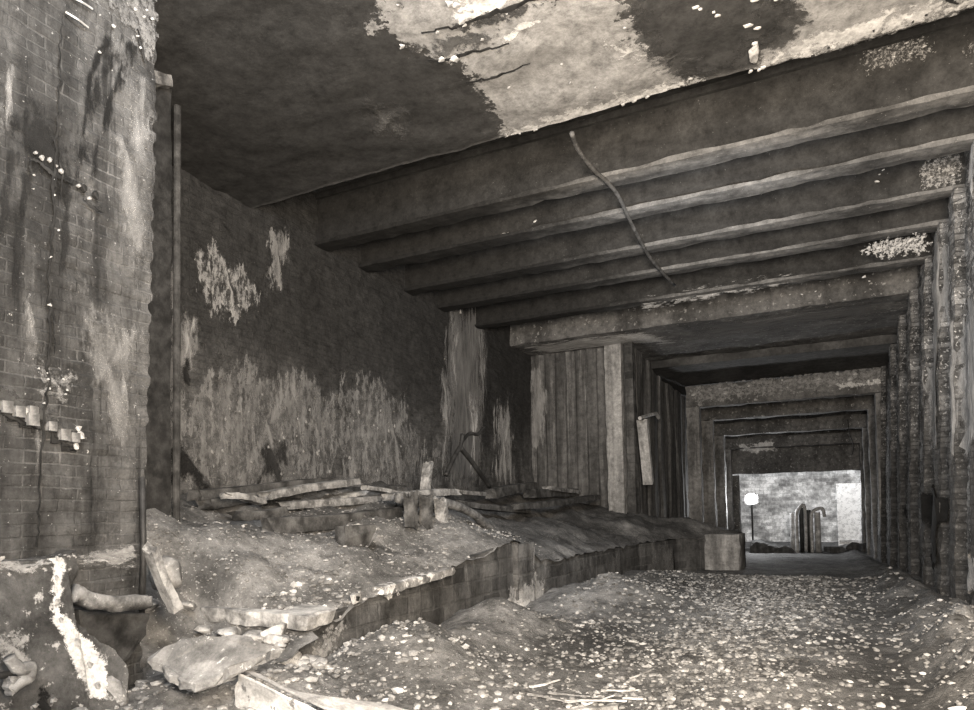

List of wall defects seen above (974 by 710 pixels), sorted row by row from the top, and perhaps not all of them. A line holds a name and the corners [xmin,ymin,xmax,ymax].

damp [78,35,111,157]
damp [92,41,137,176]
peeling [364,0,706,137]
damp [0,151,31,289]
damp [61,193,72,266]
peeling [194,227,290,326]
damp [34,363,78,404]
peeling [170,264,441,489]
spalling [48,556,110,700]